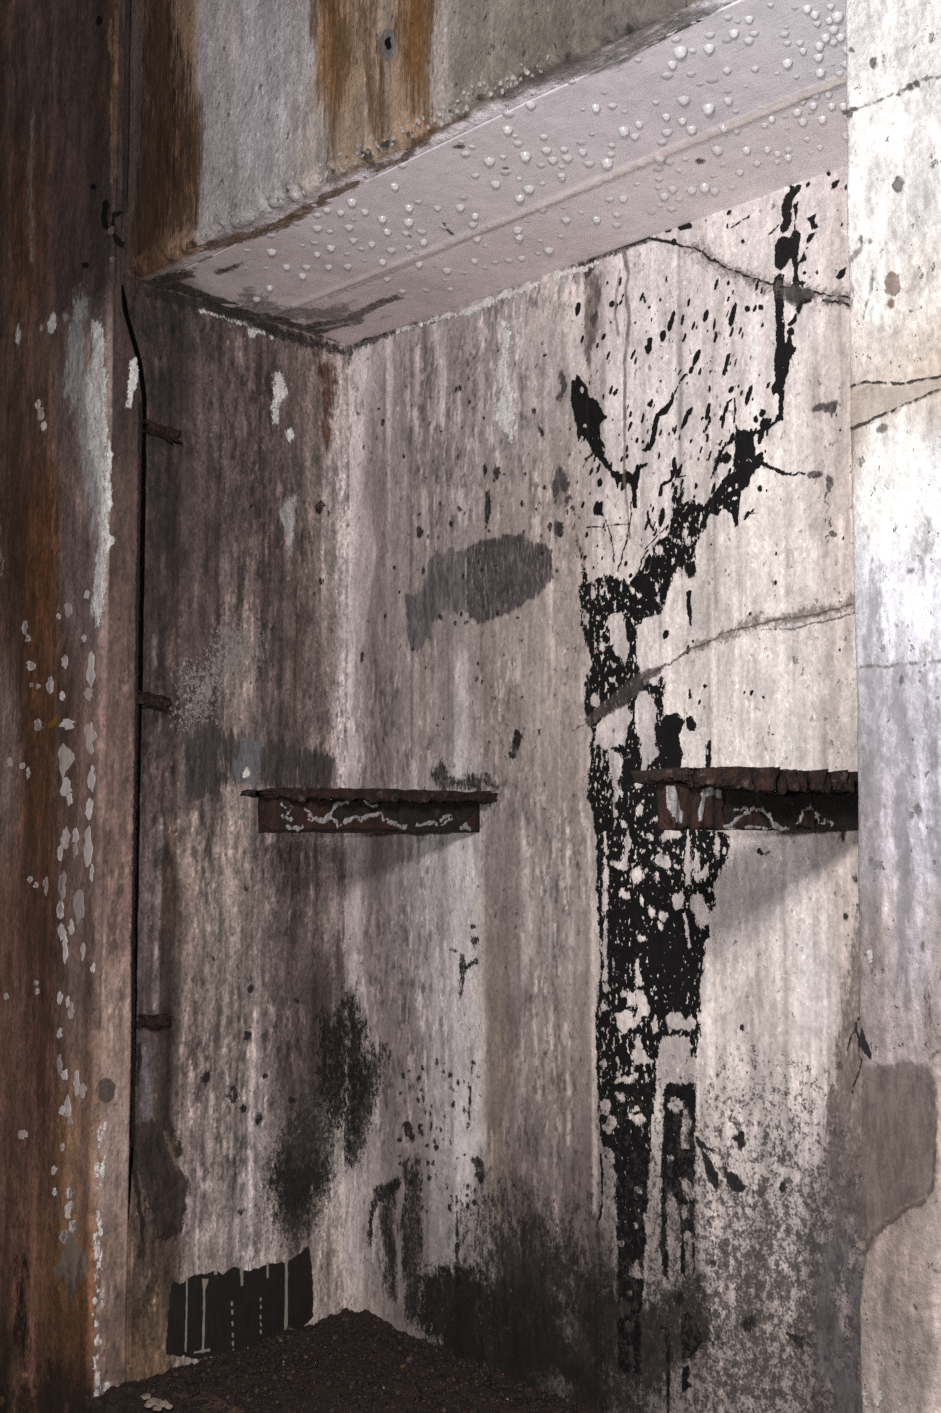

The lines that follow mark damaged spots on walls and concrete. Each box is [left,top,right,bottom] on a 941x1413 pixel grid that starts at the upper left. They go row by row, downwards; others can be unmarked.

rust [131,0,203,297]
rust [310,0,386,152]
rust [394,0,437,124]
crack [842,75,941,119]
crack [647,237,850,309]
water stain [752,184,812,434]
peeling [26,654,68,701]
crack [572,593,855,731]
peeling [27,718,97,973]
water stain [449,924,480,998]
peeling [56,992,87,1127]
water stain [237,985,484,1326]